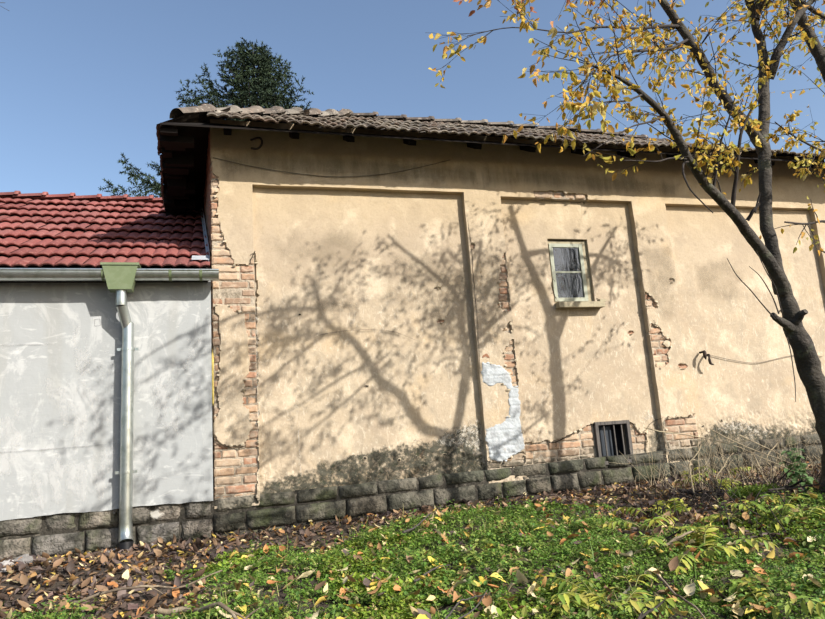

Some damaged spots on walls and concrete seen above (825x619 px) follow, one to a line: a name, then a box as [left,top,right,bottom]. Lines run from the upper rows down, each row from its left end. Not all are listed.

flaking render [211,163,260,500]
flaking render [497,255,510,312]
flaking render [640,294,659,312]
flaking render [645,324,672,370]
peeling [481,322,597,470]
water stain [260,425,488,494]
flaking render [630,423,648,454]
flaking render [664,414,708,450]